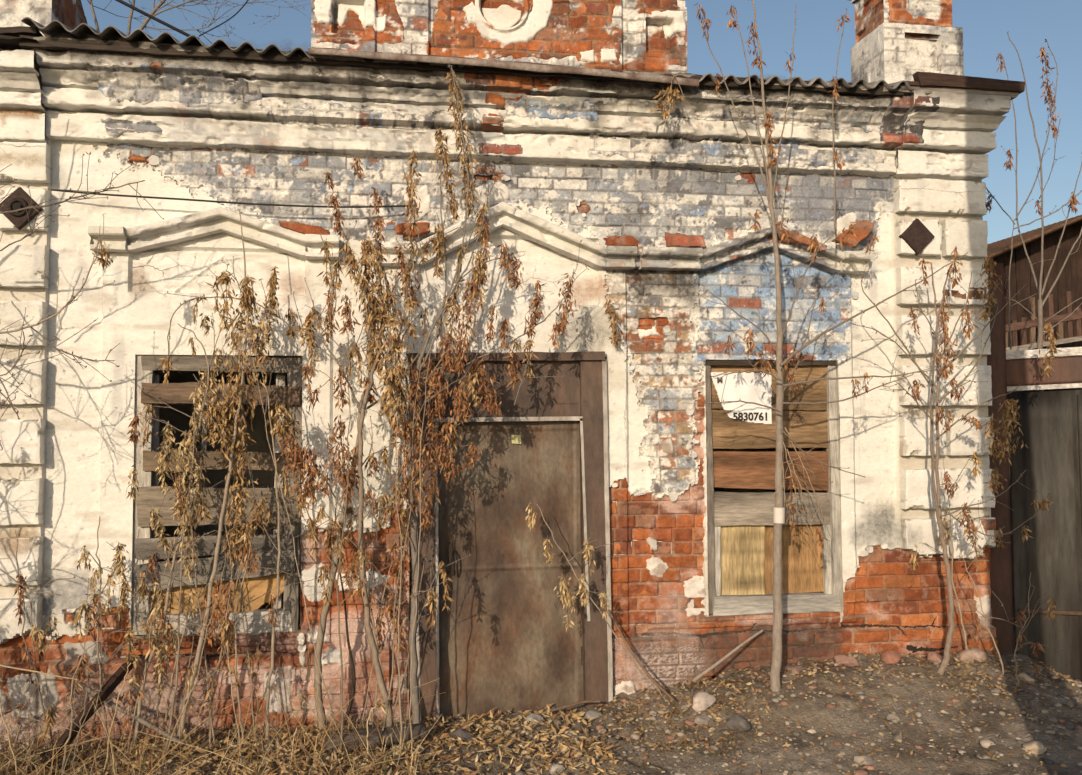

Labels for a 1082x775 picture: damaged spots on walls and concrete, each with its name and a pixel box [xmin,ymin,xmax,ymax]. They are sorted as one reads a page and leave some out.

peeling [80,0,940,262]
spalling [605,249,998,696]
spalling [0,502,410,755]